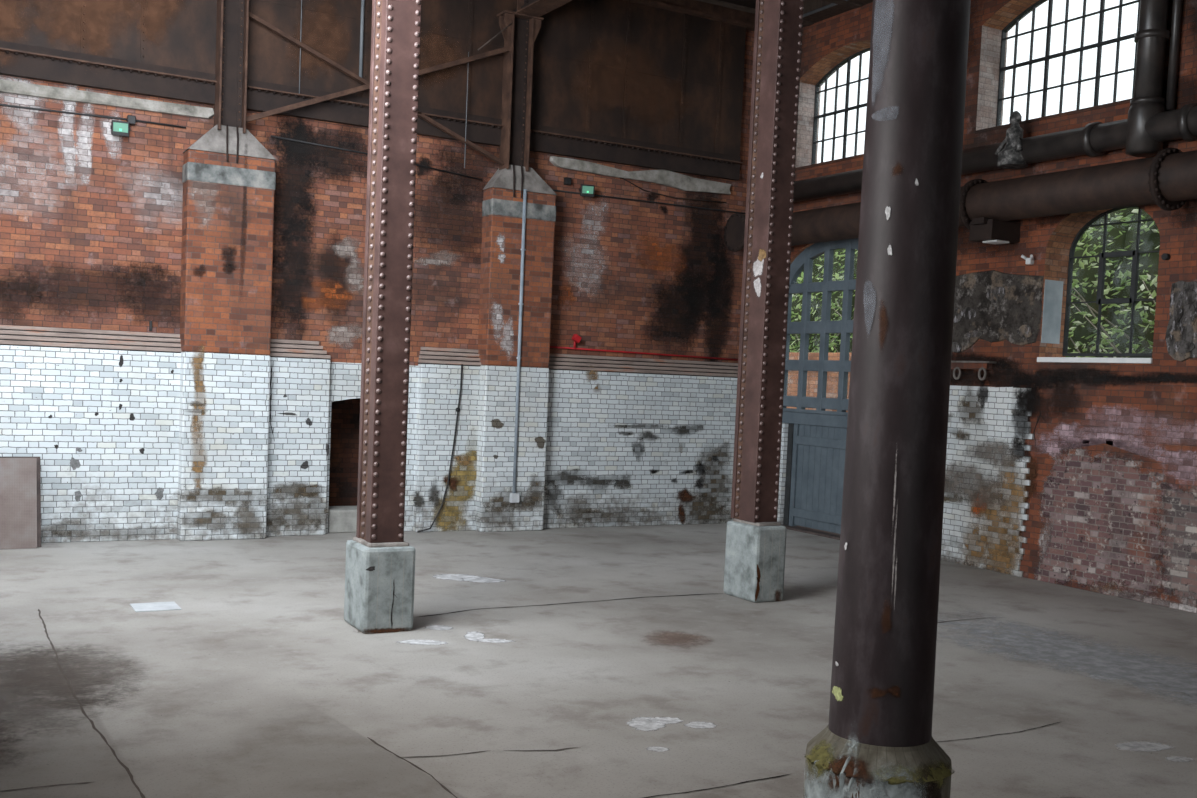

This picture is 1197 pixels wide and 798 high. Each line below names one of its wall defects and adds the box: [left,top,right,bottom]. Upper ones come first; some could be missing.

damp [4,79,39,126]
damp [58,86,119,184]
rust [191,347,206,489]
damp [413,451,657,530]
damp [615,424,703,458]
damp [672,446,730,524]
damp [942,438,1029,574]
damp [950,361,1057,416]
spalling [1034,447,1197,607]
damp [1041,409,1197,495]
crack [38,609,145,798]
rust [826,755,871,798]